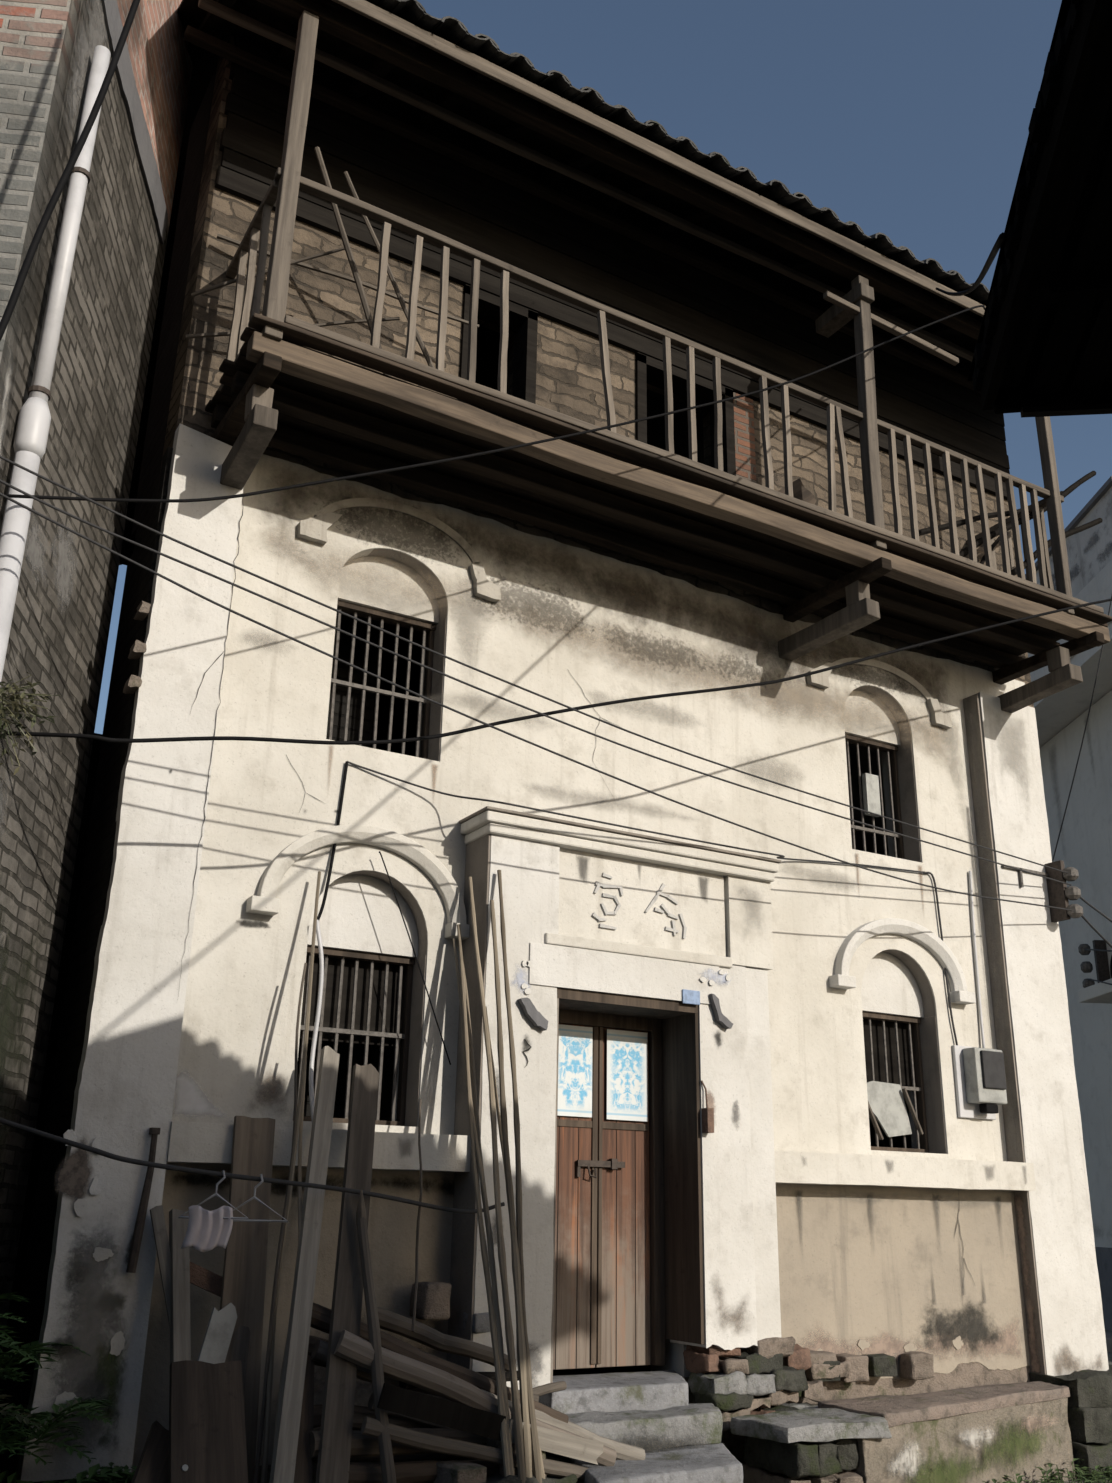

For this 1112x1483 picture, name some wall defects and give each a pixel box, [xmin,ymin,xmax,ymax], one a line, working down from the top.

flaking render [56,1129,105,1217]
flaking render [47,1235,133,1445]
water stain [924,1289,998,1351]